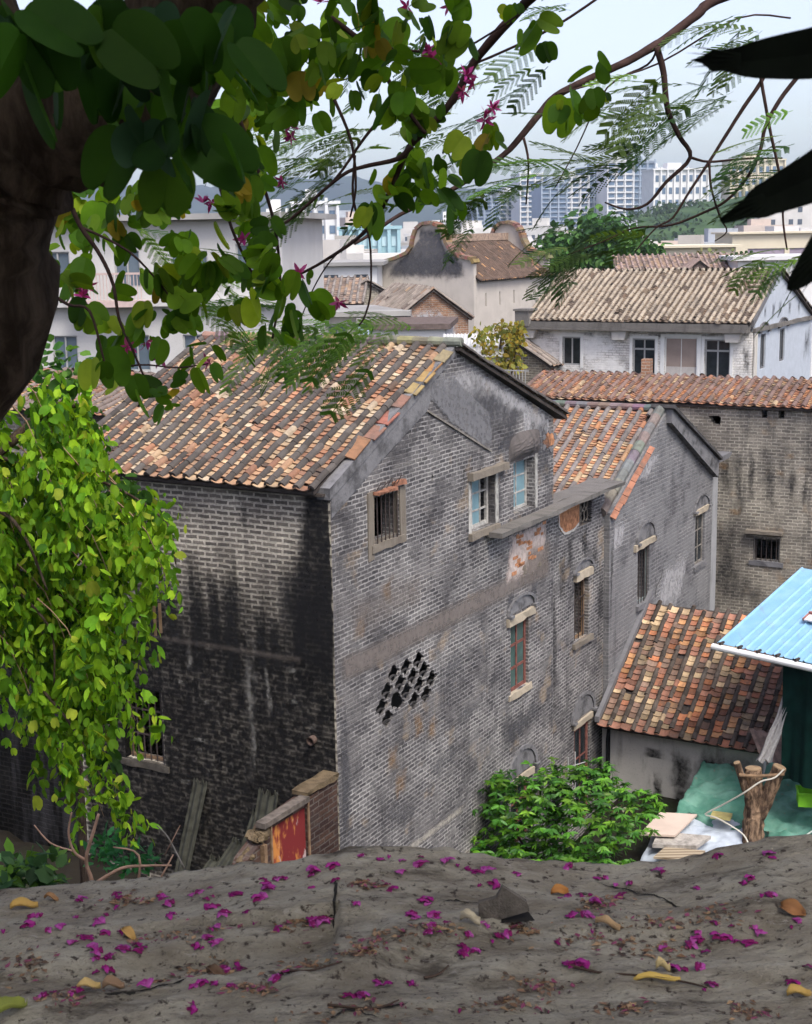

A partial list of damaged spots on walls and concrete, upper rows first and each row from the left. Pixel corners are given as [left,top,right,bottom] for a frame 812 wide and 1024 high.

damp [87,496,549,874]
flaking render [507,504,580,582]